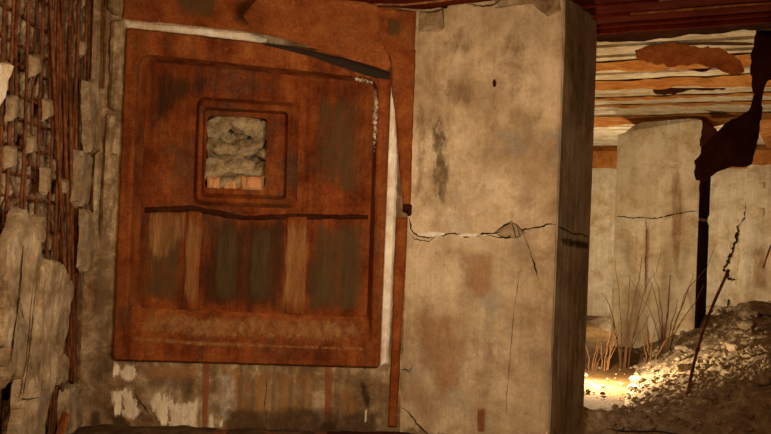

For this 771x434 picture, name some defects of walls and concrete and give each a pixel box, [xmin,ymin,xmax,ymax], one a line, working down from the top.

spalling [0,0,126,434]
rust [149,214,198,301]
rust [285,226,306,302]
crack [618,211,697,293]
crack [722,202,746,307]
crack [409,219,587,418]